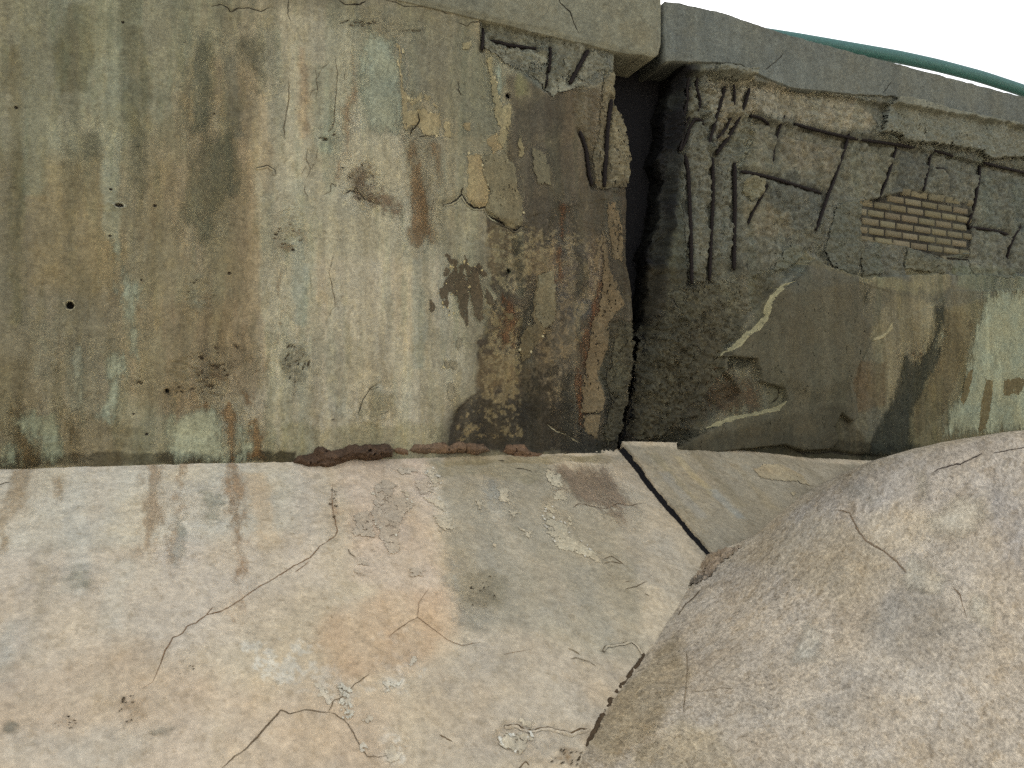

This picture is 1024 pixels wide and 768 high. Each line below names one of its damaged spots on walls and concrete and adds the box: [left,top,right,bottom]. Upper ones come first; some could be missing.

spalling [462,21,632,229]
rust [357,151,431,245]
peeling [428,254,494,326]
peeling [519,271,558,362]
spalling [580,63,1024,445]
leakage [862,306,944,457]
leakage [943,289,1024,436]
leakage [17,410,63,462]
leakage [164,408,253,463]
crack [148,485,354,685]
crack [390,591,479,646]
crack [223,674,382,767]